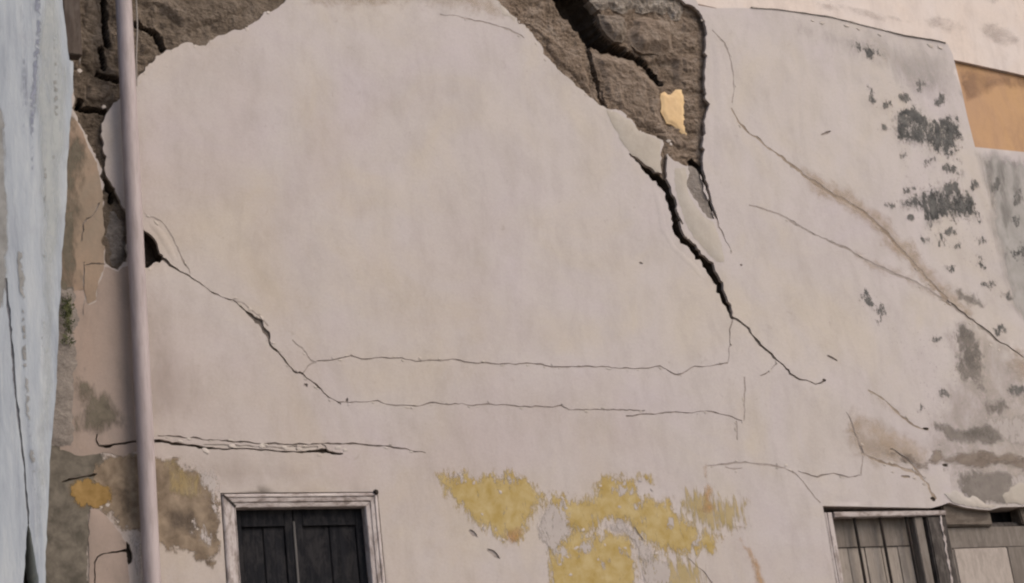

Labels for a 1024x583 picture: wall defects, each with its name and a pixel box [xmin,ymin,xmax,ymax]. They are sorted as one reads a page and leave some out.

spalling [71,0,127,270]
spalling [132,0,285,85]
spalling [498,0,713,219]
crack [712,30,1021,356]
damp [868,79,1024,315]
flaking render [45,446,142,583]
flaking render [155,457,221,567]
crack [95,435,417,457]
crack [163,139,936,503]
damp [933,325,986,403]
damp [929,424,1024,504]
mould [986,384,1024,413]